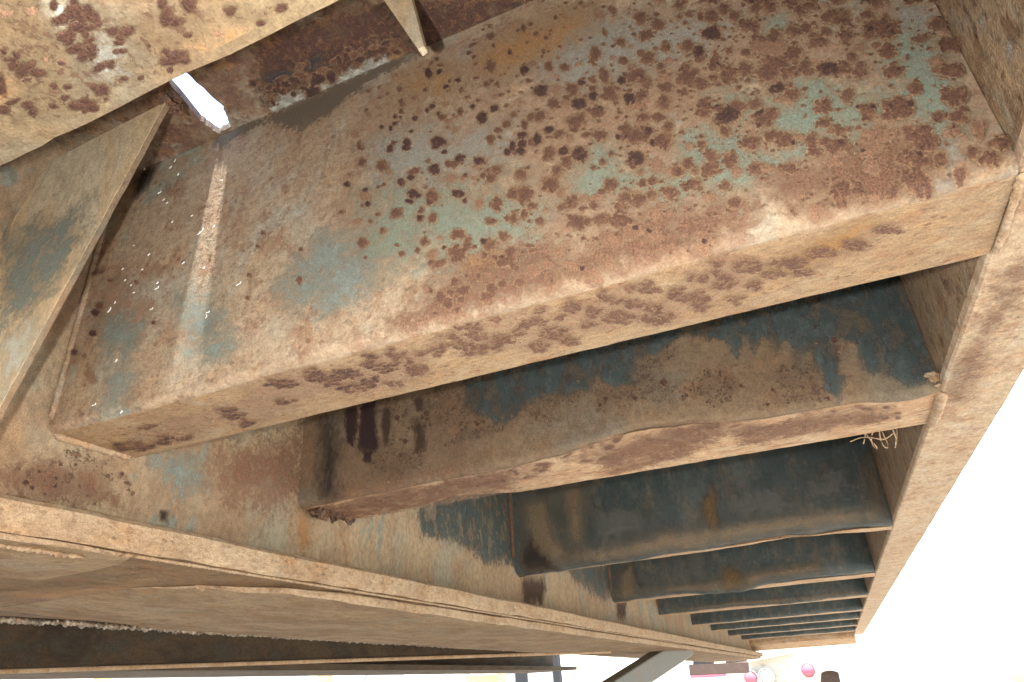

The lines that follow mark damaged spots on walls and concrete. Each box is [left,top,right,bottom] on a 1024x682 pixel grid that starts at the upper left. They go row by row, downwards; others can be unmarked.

rust [0,0,1014,549]